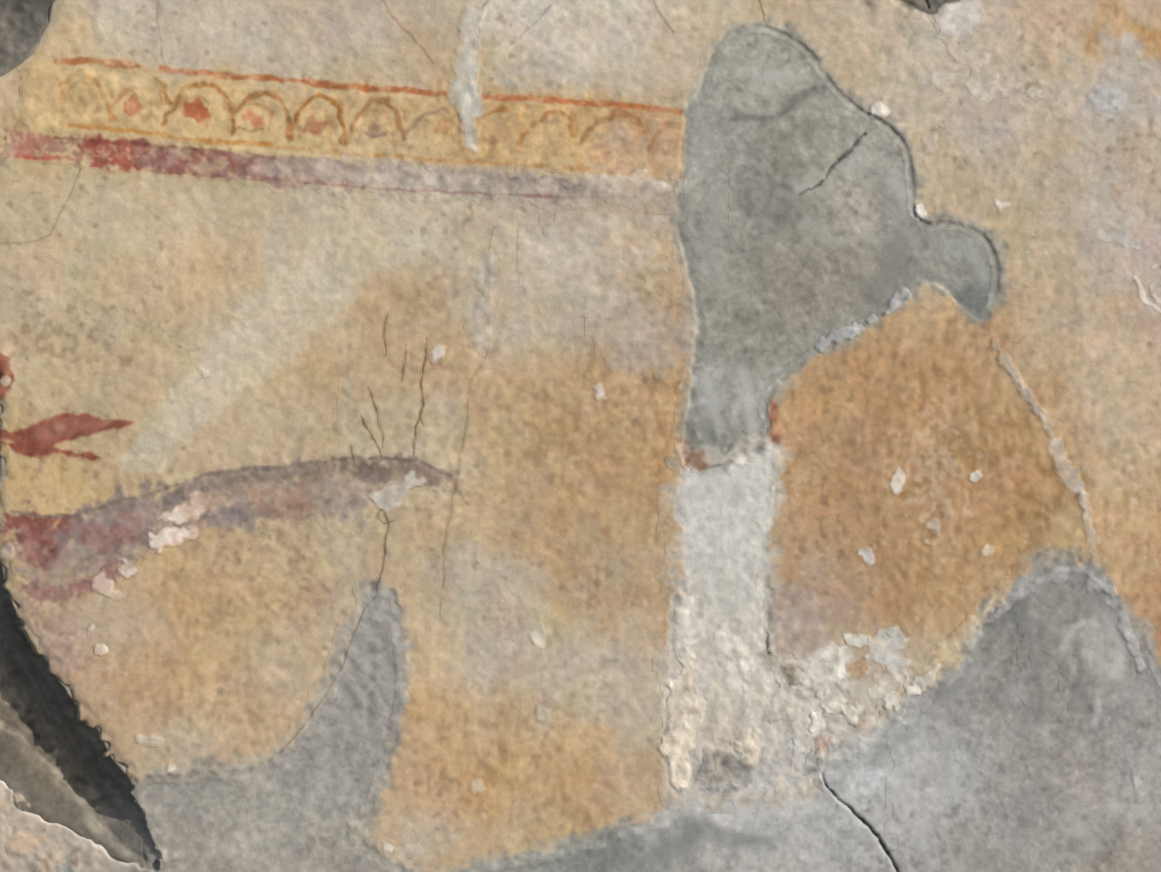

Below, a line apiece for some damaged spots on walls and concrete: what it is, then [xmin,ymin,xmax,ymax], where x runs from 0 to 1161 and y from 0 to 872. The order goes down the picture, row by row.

crack [757,0,765,22]
peeling [931,31,1055,104]
peeling [869,101,892,120]
crack [797,132,867,197]
peeling [914,202,928,222]
crack [350,314,428,467]
crack [439,348,489,618]
peeling [856,542,876,568]
peeling [528,620,548,651]
peeling [657,589,943,792]
peeling [164,761,178,774]
crack [830,790,899,872]